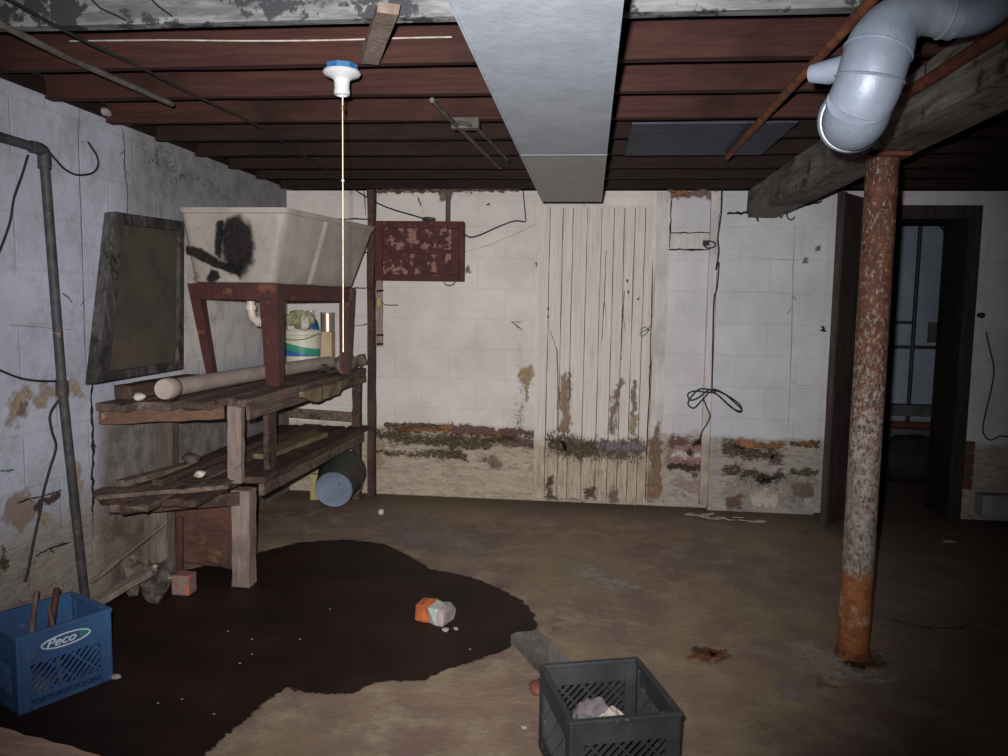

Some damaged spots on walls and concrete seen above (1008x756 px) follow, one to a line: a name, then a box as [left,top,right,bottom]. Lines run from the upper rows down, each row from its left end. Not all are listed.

peeling [5,382,58,426]
leakage [518,365,535,402]
leakage [376,372,700,501]
leakage [720,438,821,485]
leakage [581,486,618,504]
leakage [0,511,539,756]
corrosion [688,646,730,664]